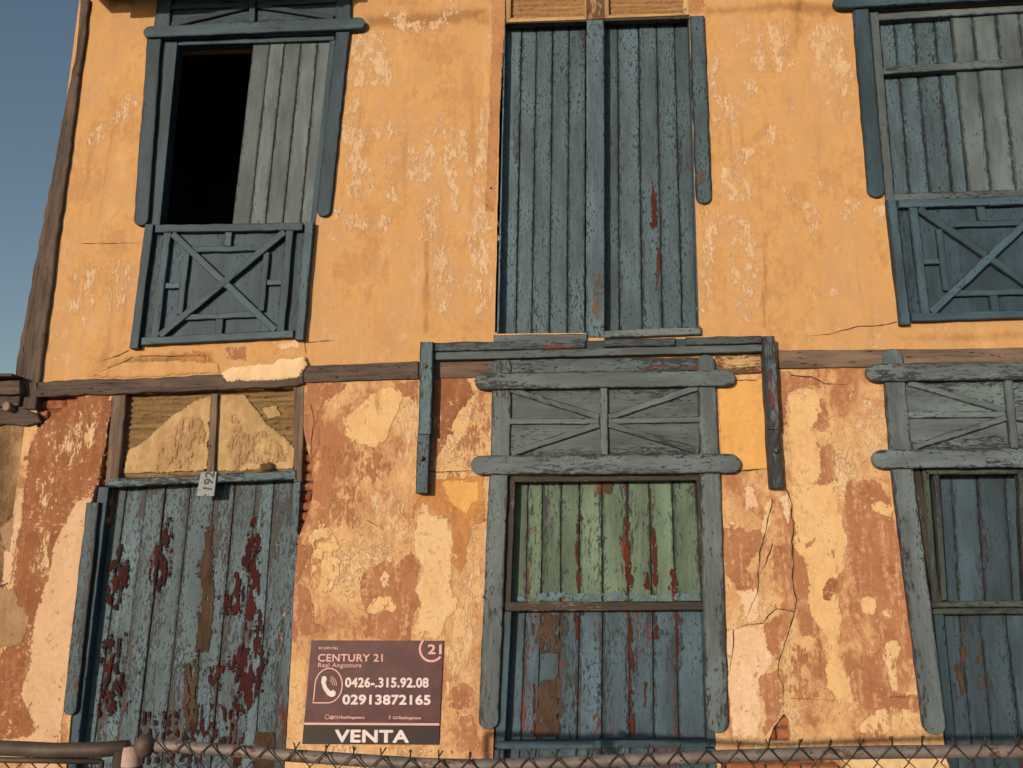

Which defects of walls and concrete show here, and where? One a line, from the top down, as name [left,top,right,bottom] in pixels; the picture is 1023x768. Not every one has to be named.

peeling [707,18,796,129]
peeling [807,23,854,97]
flaking render [332,0,505,323]
peeling [721,145,756,202]
peeling [778,175,886,238]
peeling [696,210,761,324]
peeling [0,395,117,740]
peeling [97,378,491,754]
crack [728,490,824,712]
peeling [717,371,920,739]
peeling [141,752,221,768]
peeling [721,759,949,768]